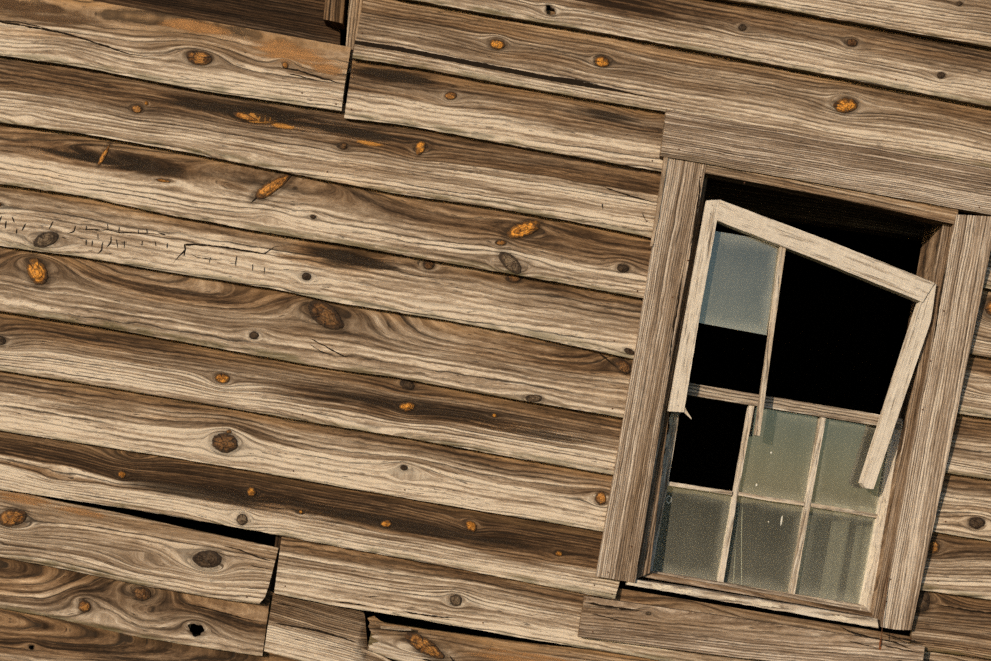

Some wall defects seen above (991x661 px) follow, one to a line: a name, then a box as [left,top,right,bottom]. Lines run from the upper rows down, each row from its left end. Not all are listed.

crack [0,213,285,271]